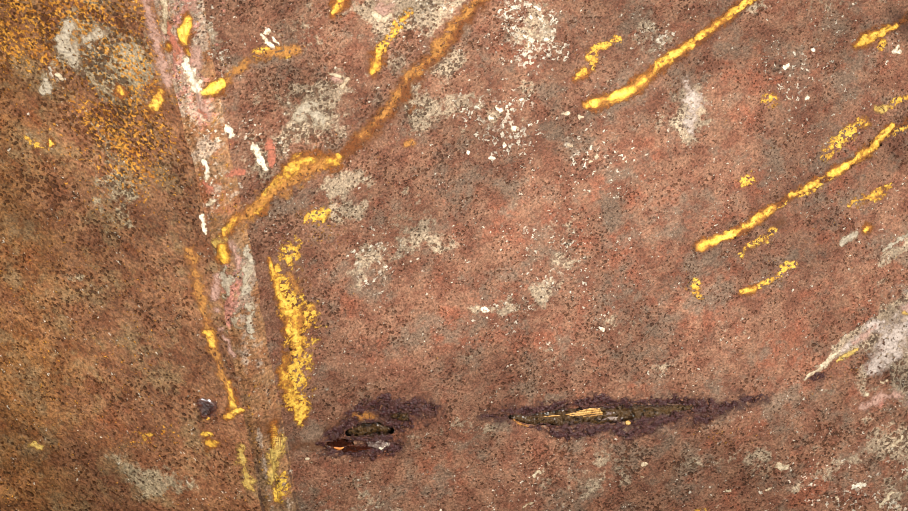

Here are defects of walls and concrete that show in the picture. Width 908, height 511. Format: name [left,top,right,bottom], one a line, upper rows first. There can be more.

rust [164,11,196,58]
rust [571,35,622,83]
rust [582,0,757,114]
rust [852,11,908,52]
rust [198,0,490,265]
rust [694,95,908,257]
rust [738,261,798,296]
rust [185,248,245,422]
rust [267,235,327,427]
rust [266,419,291,503]
rust [315,393,441,461]
rust [481,392,763,442]